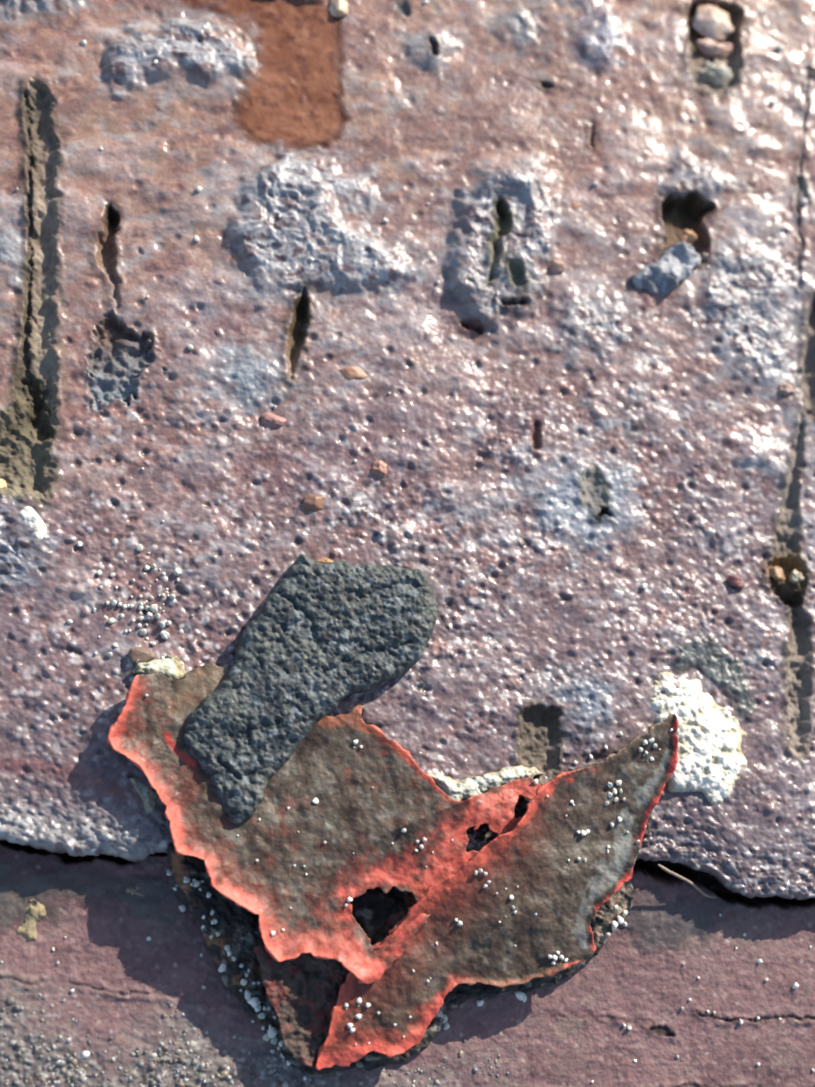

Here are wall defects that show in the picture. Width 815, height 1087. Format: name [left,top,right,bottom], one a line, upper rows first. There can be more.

spalling [687,0,745,94]
water stain [0,236,25,284]
spalling [630,190,716,296]
water stain [0,498,58,594]
water stain [673,638,754,718]
crack [649,1026,675,1037]
crack [698,1012,815,1023]